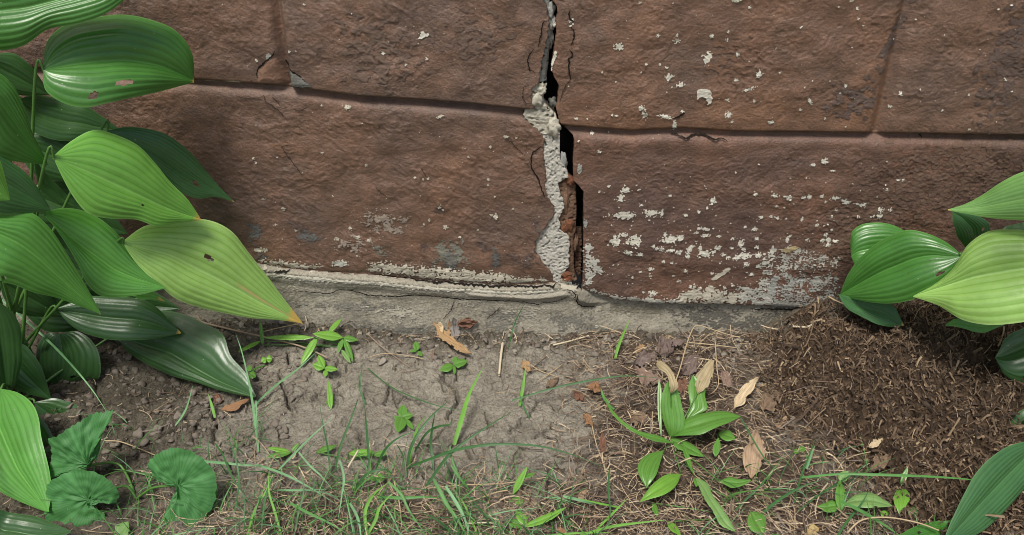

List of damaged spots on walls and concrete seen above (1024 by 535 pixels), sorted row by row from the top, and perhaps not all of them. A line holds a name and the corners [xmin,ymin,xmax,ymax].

peeling [290,71,311,88]
crack [268,0,595,319]
spalling [366,0,893,305]
crack [670,111,728,142]